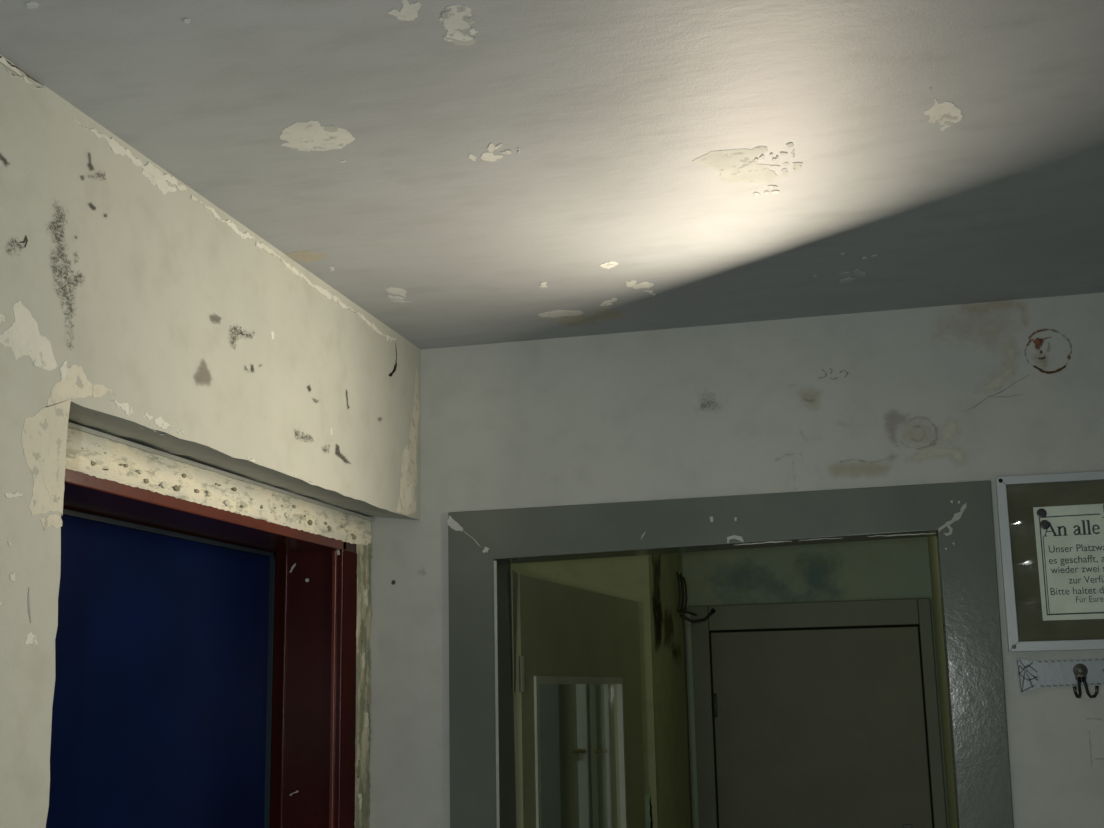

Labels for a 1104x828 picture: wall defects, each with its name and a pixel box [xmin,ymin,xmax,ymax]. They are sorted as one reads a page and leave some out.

peeling [439,4,479,46]
peeling [924,88,964,131]
peeling [280,120,355,163]
peeling [692,142,803,196]
leakage [50,209,82,320]
corrosion [1025,329,1072,374]
spalling [0,300,375,828]
peeling [727,535,840,545]
peeling [867,500,967,550]
leakage [653,556,673,647]